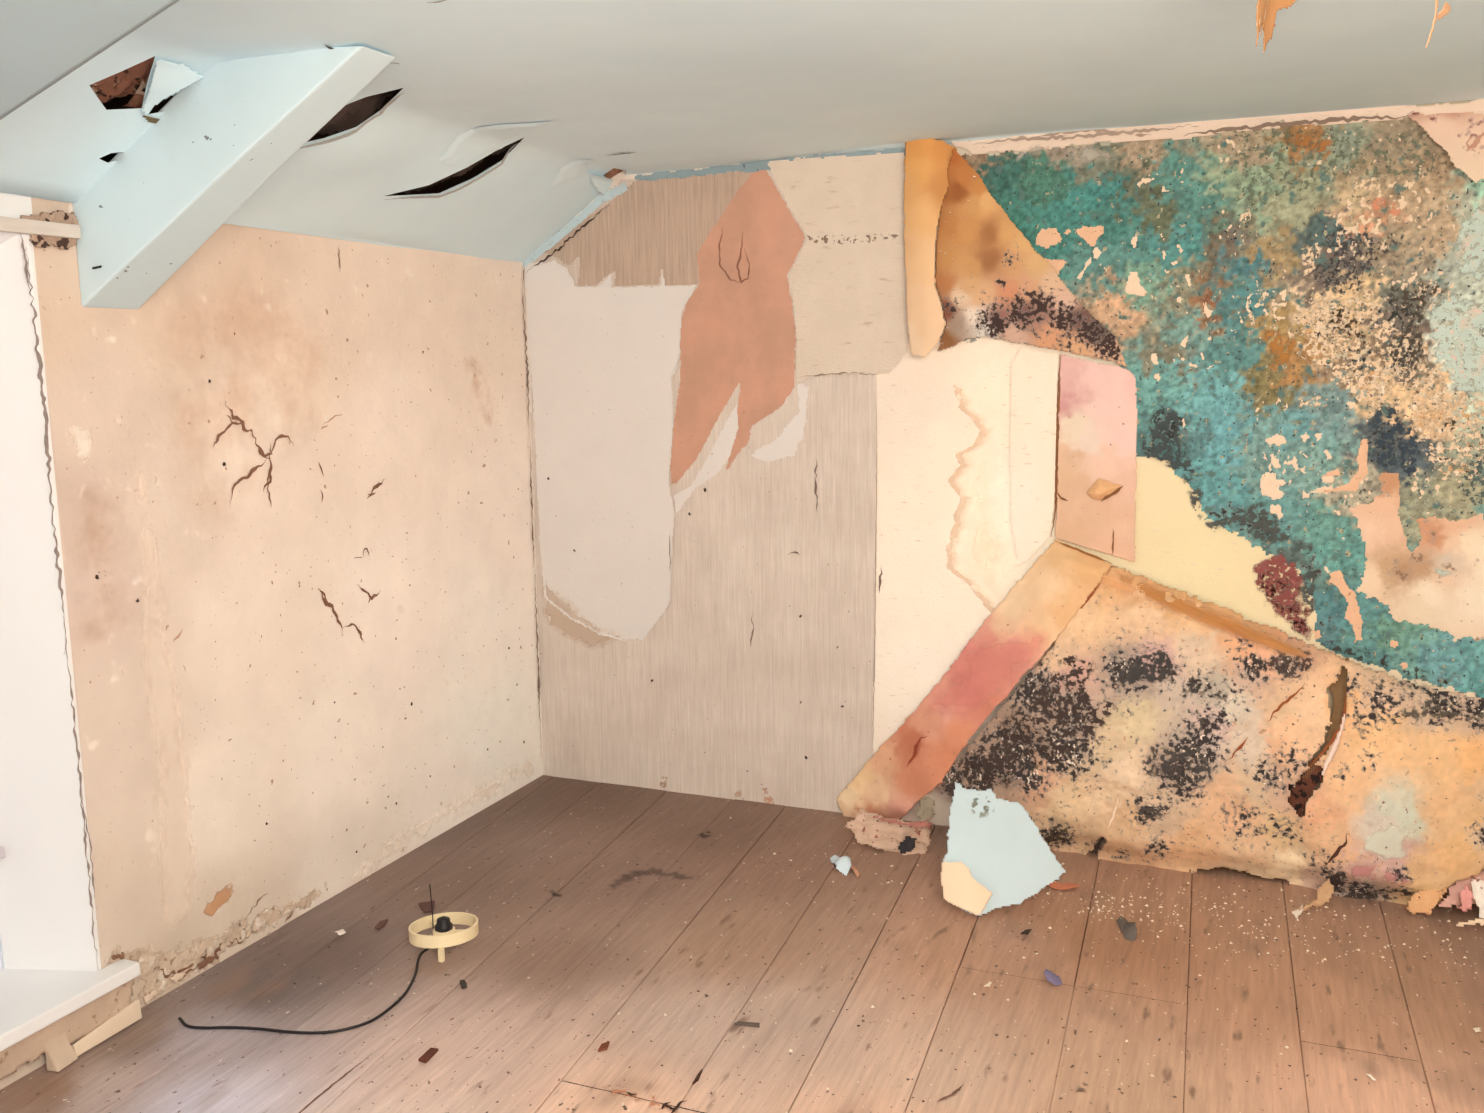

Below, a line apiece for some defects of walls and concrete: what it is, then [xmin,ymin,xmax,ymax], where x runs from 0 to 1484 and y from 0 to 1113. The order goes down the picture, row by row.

peeling [1256,0,1296,53]
flaking render [670,170,805,484]
peeling [904,99,1484,698]
crack [213,401,342,503]
crack [319,548,379,643]
mould [940,655,1118,801]
mould [1117,650,1173,685]
mould [1141,718,1211,785]
mould [1182,685,1227,699]
mould [1135,803,1170,824]
mould [1329,826,1415,901]
flaking render [109,890,320,1004]